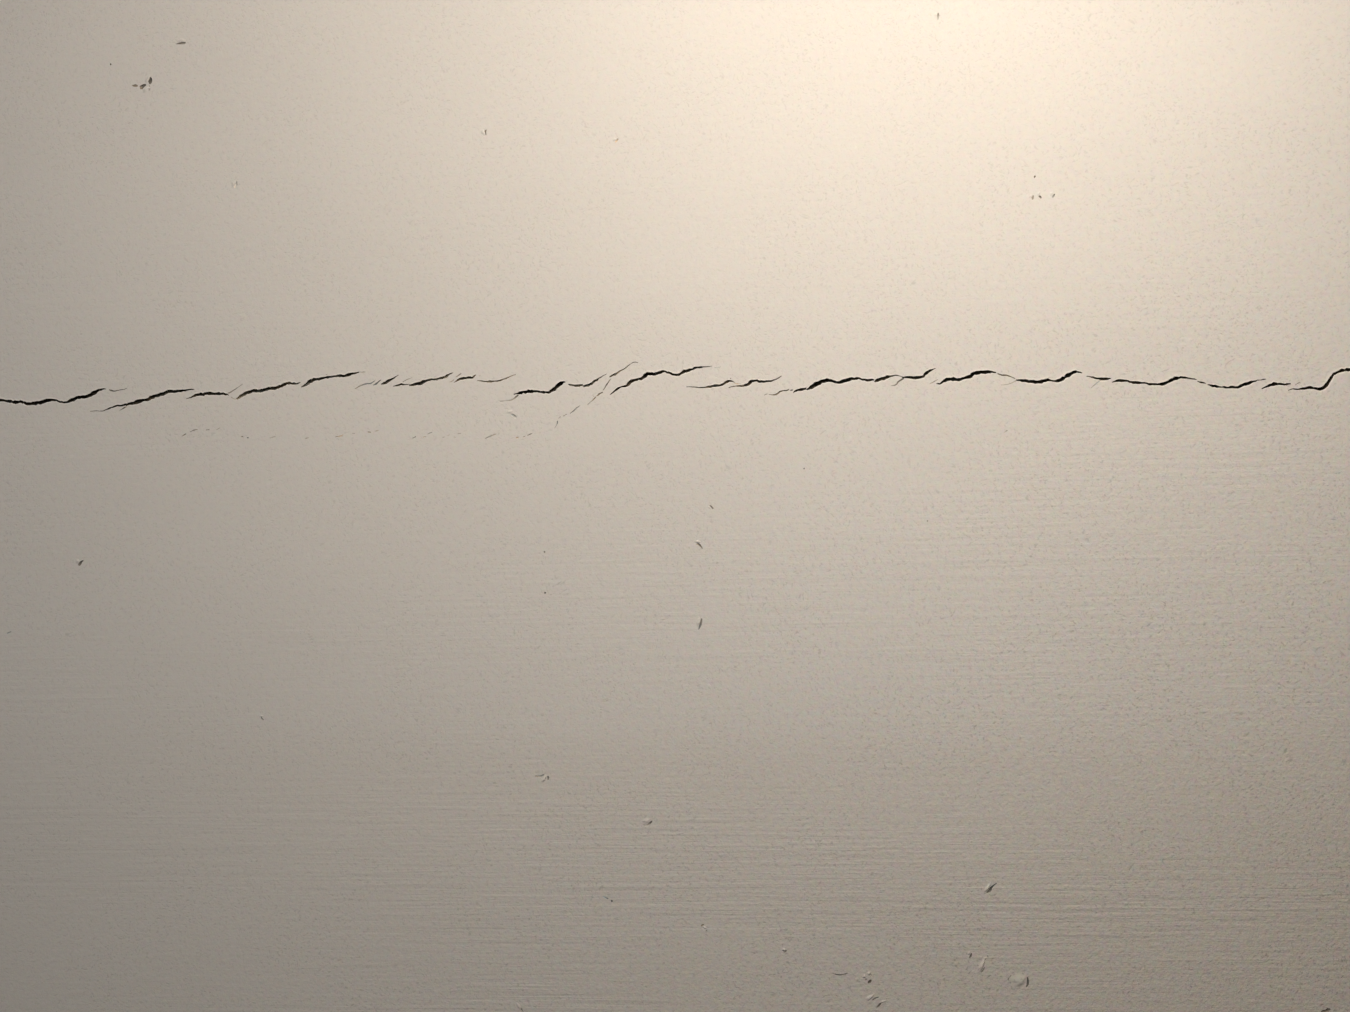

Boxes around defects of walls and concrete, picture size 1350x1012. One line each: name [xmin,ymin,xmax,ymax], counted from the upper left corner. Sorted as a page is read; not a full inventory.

crack [0,362,1350,439]